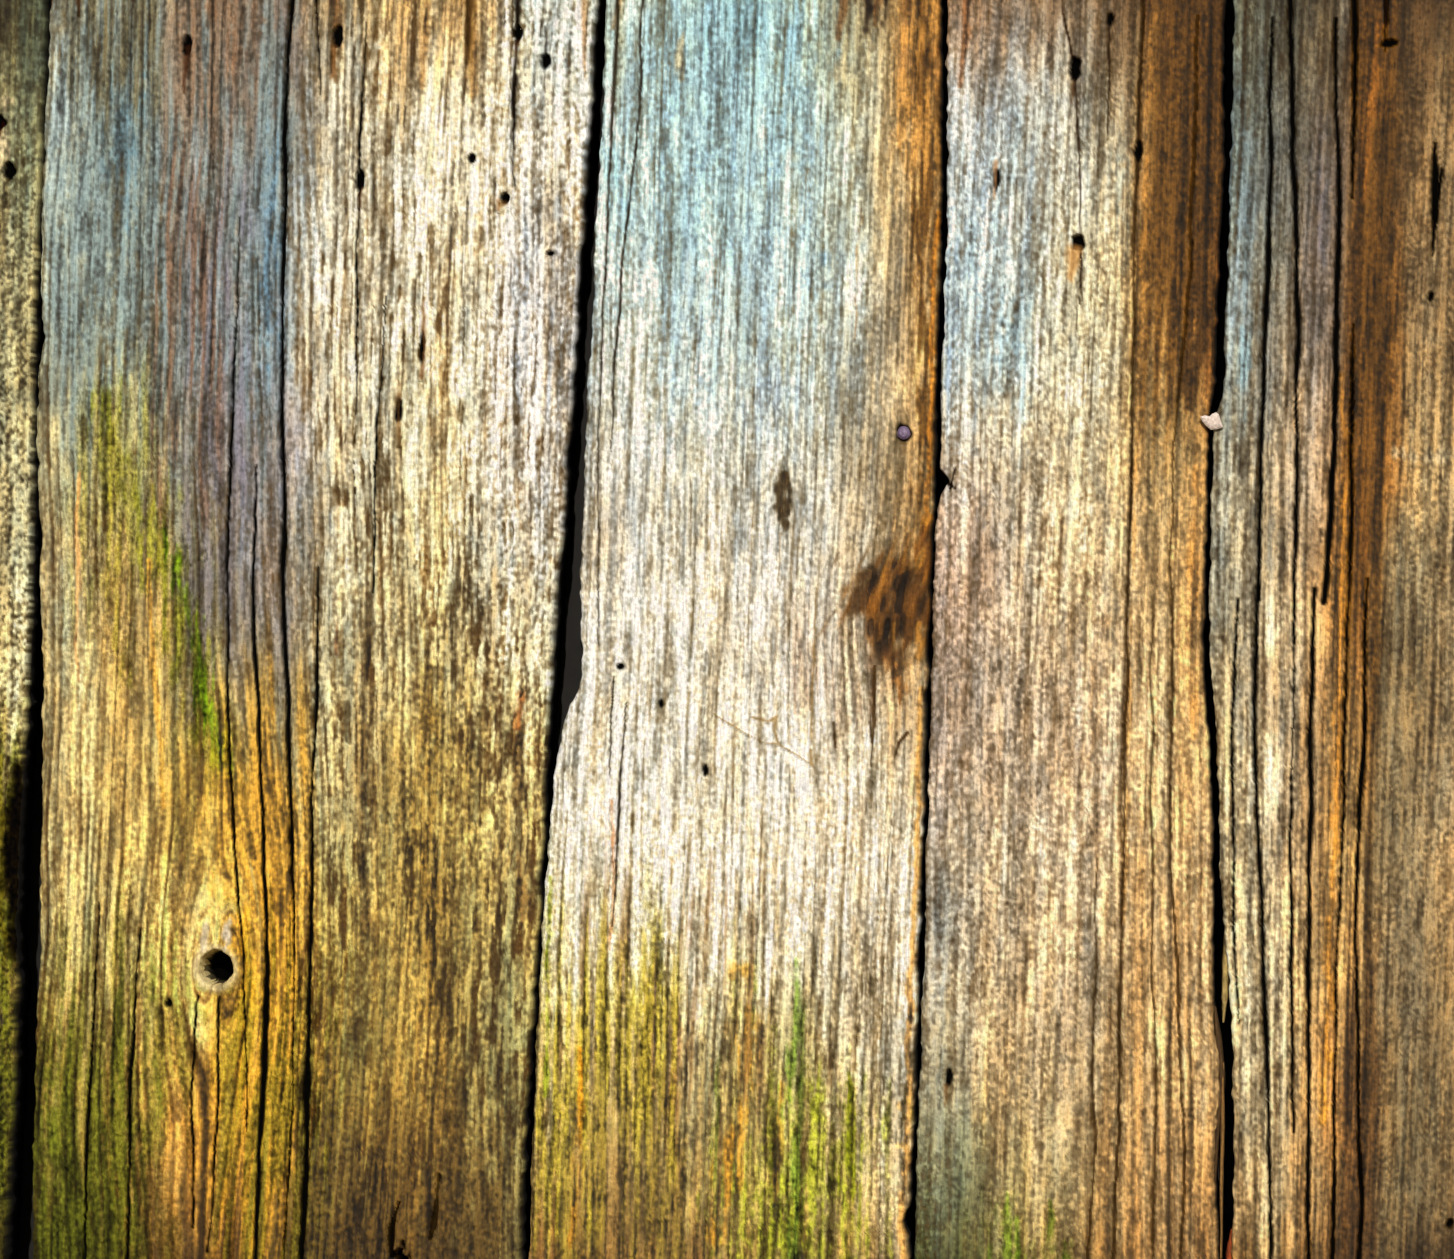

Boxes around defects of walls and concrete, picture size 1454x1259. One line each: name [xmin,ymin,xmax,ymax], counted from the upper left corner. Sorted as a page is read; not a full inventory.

crack [356,21,368,169]
damp [56,328,221,737]
crack [188,0,322,1259]
crack [352,217,388,594]
damp [776,426,932,751]
crack [1227,0,1370,1259]
crack [82,901,143,1259]
damp [35,585,913,1259]